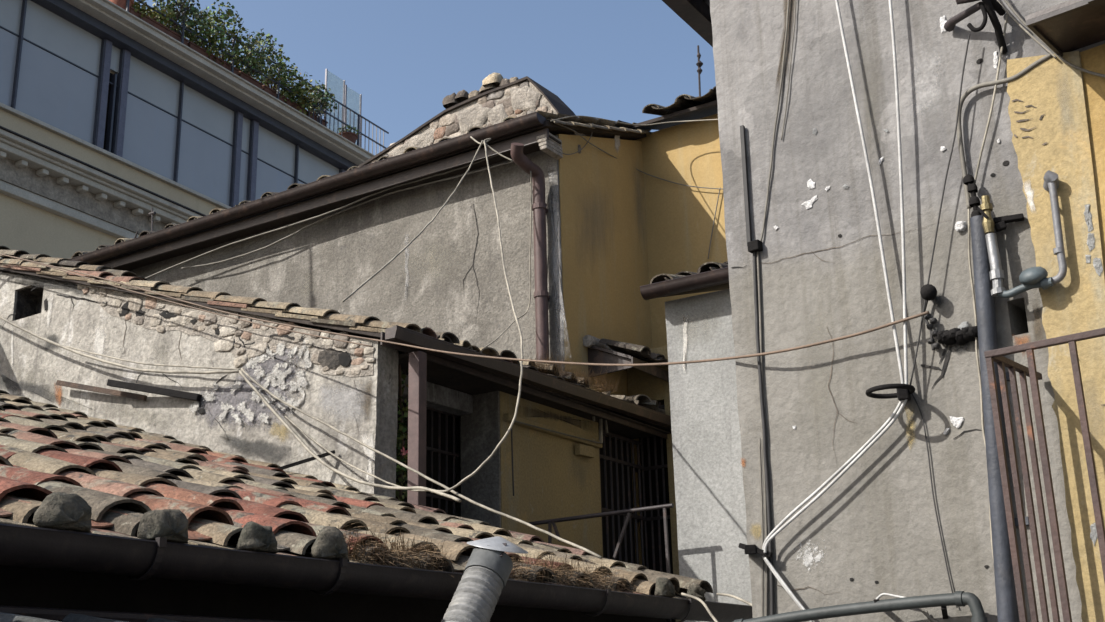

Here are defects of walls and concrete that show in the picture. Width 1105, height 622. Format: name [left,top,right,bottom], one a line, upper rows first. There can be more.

peeling [801,179,849,210]
crack [463,204,479,317]
flaking render [77,284,376,437]
peeling [1090,523,1098,545]